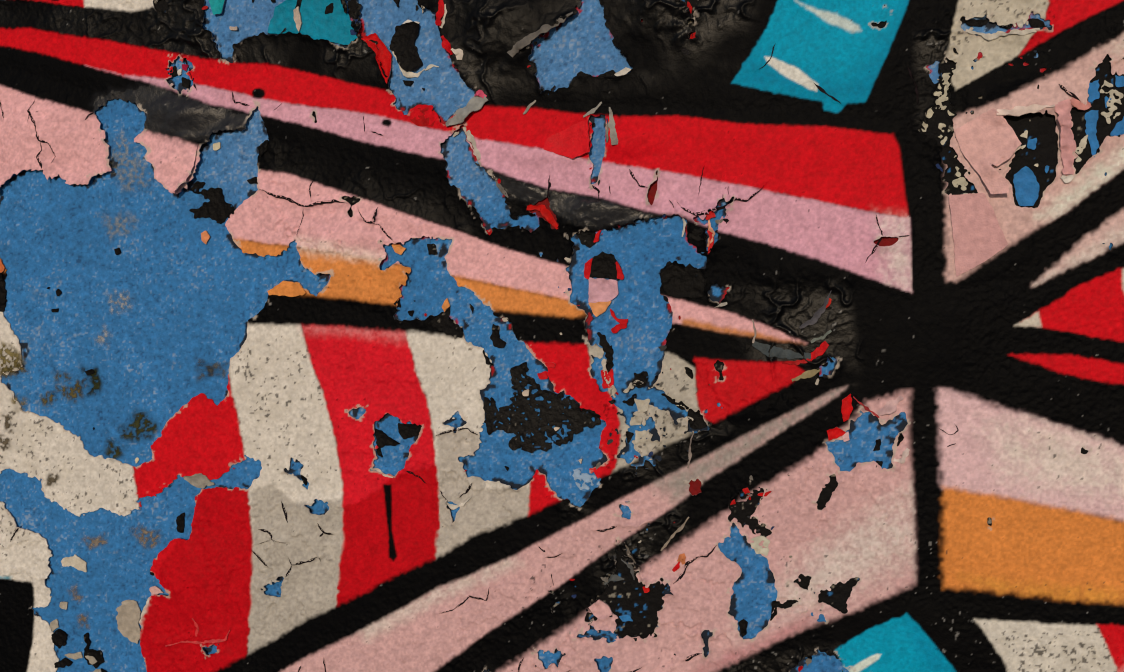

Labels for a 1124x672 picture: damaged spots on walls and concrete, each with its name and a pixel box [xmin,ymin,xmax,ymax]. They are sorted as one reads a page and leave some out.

peeling [960,11,1052,70]
crack [0,102,55,168]
peeling [918,48,1124,277]
peeling [0,99,331,467]
peeling [202,0,735,515]
peeling [816,393,910,510]
peeling [0,455,262,672]
crack [253,502,332,576]
peeling [577,523,686,672]
peeling [701,630,713,657]
peeling [718,475,860,639]
peeling [790,649,849,672]